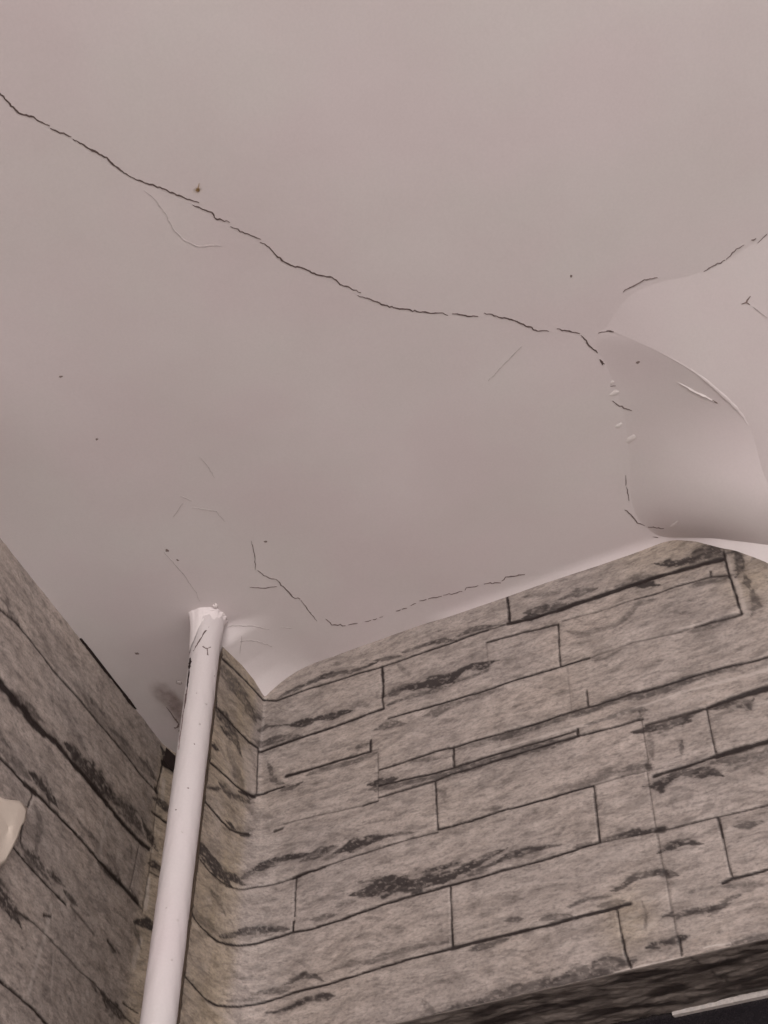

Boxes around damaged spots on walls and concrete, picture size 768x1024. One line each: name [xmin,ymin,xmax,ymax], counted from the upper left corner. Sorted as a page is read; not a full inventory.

crack [0,93,632,411]
crack [705,234,767,271]
crack [625,480,664,538]
crack [250,541,525,626]